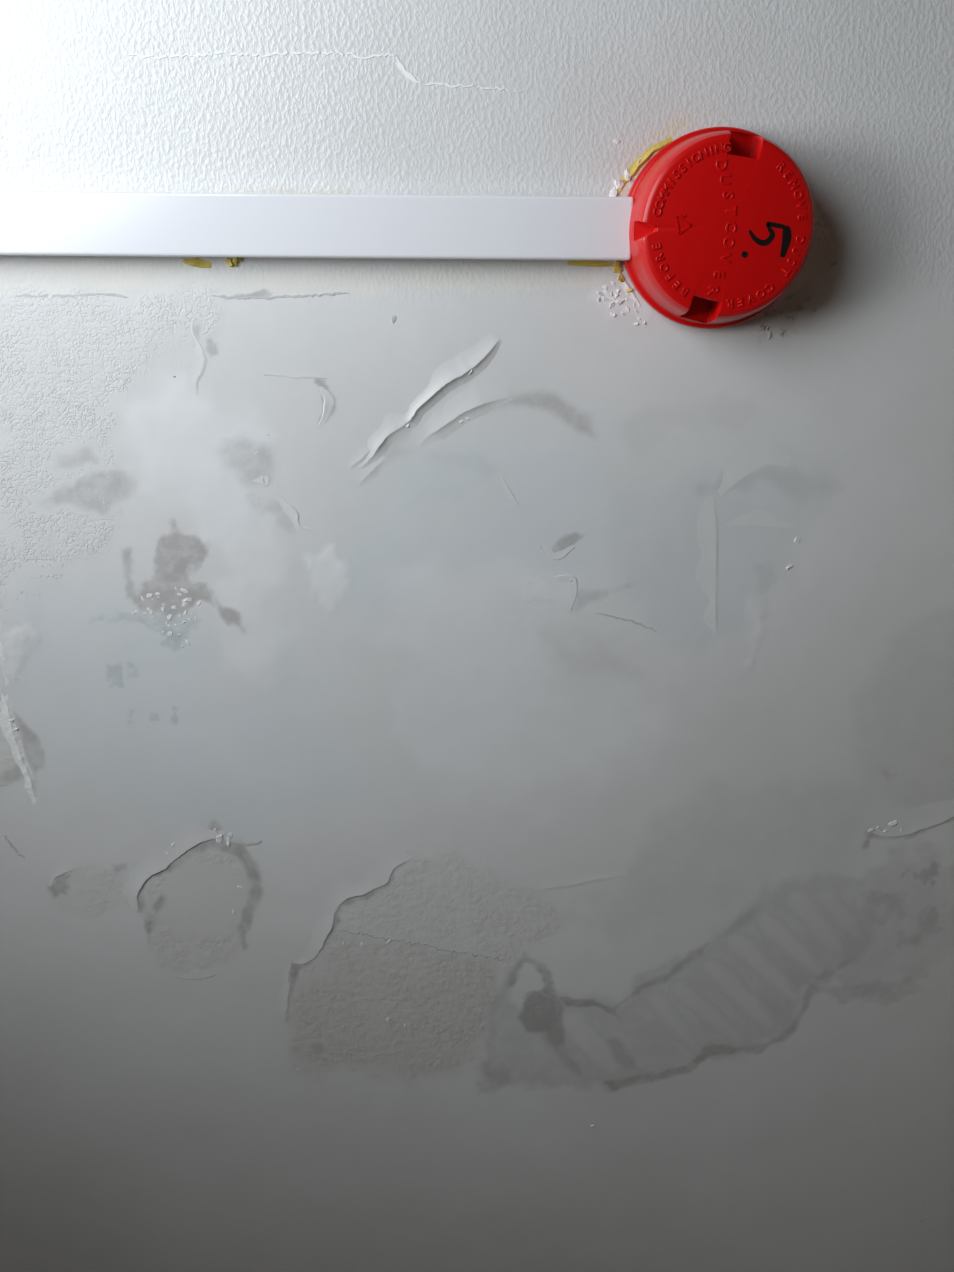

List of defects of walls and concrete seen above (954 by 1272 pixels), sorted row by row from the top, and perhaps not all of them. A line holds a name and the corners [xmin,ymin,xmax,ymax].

water stain [209,431,315,539]
water stain [457,379,789,468]
flaking render [0,676,48,805]
flaking render [122,817,271,986]
water stain [470,597,954,1101]